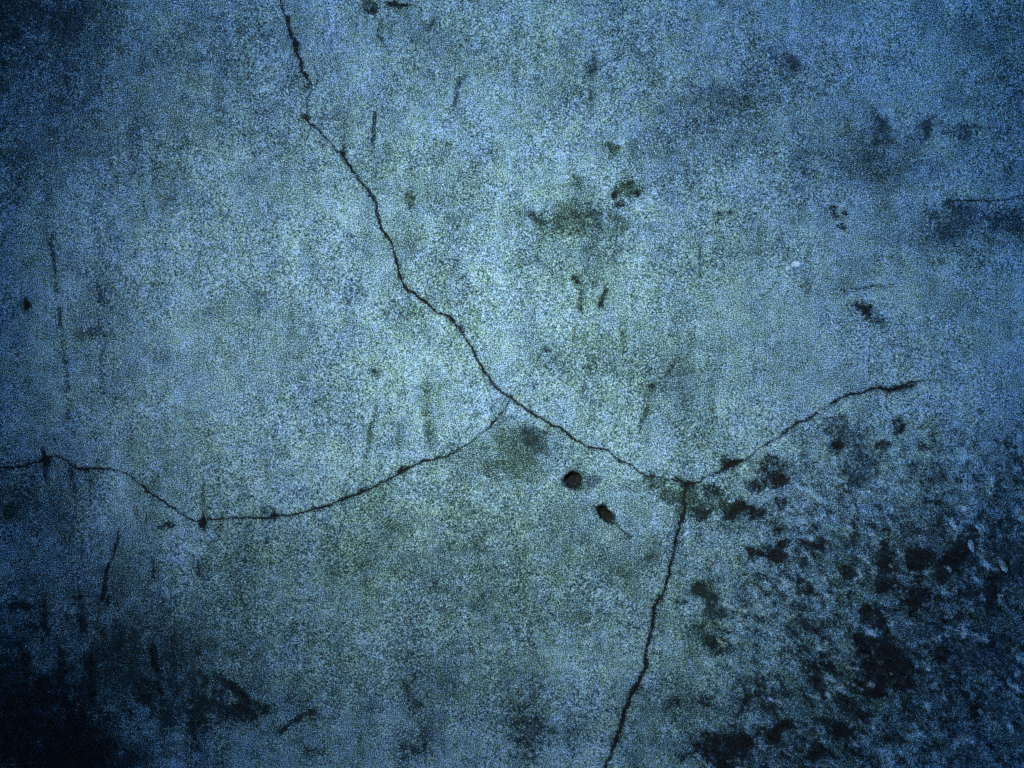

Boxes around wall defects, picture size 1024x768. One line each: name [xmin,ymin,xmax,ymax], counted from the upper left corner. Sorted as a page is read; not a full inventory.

crack [0,399,514,531]
crack [278,0,927,768]
damp [662,446,1024,768]
damp [871,412,911,454]